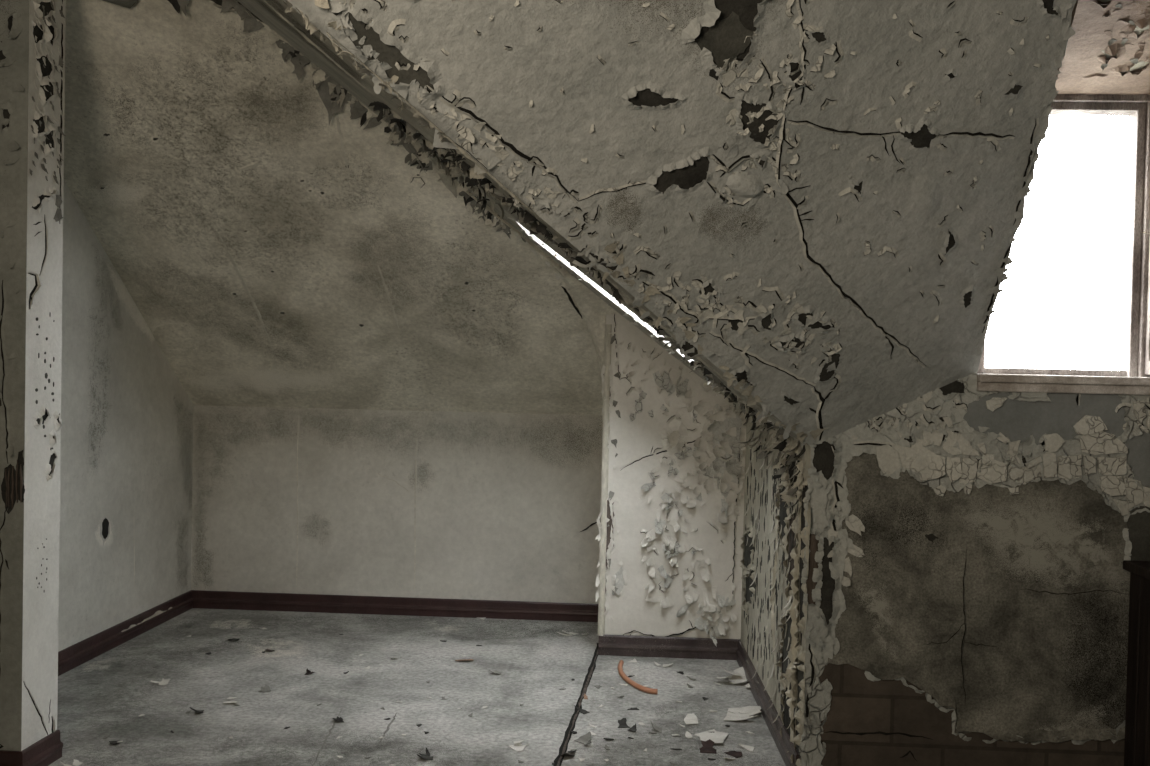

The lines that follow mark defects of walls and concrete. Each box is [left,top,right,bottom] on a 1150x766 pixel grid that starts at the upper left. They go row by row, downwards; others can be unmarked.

spalling [0,0,66,222]
peeling [103,0,138,8]
spalling [1,450,25,514]
crack [0,509,55,748]
damp [78,0,603,590]
crack [619,371,745,637]
crack [263,0,1150,543]
spalling [268,0,1150,766]
damp [835,489,1130,731]